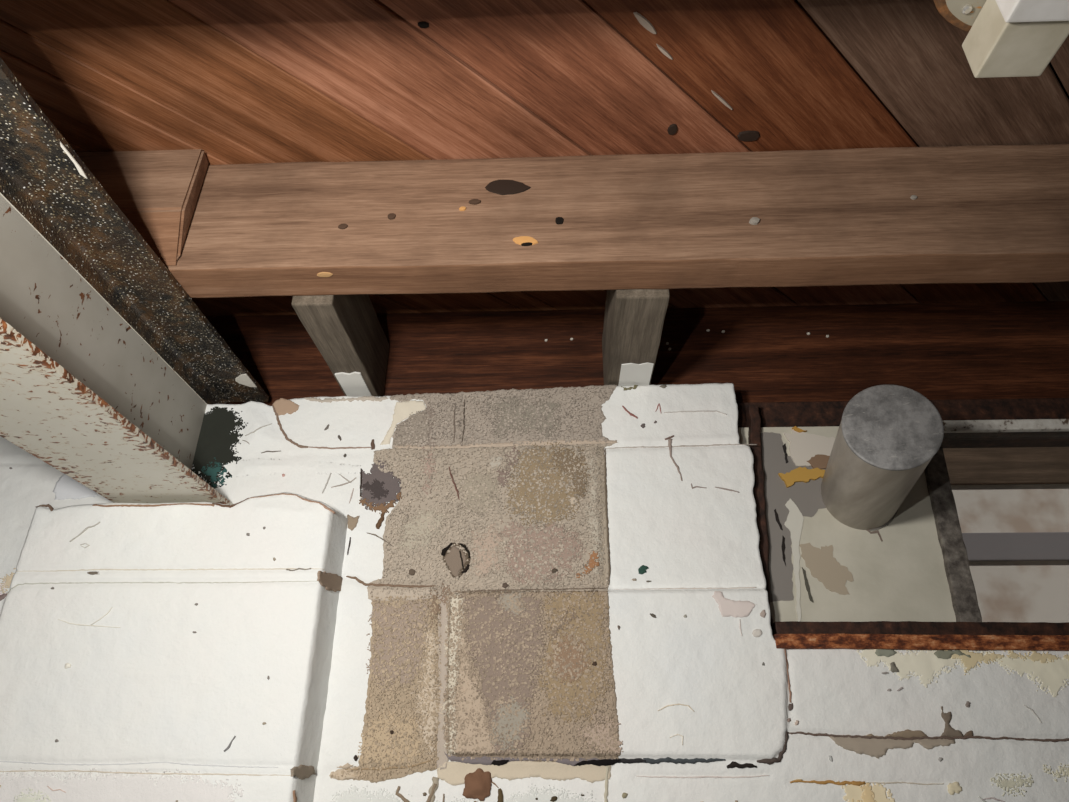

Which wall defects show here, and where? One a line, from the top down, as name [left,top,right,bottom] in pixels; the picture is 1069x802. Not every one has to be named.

peeling [273,385,638,786]
damp [331,396,623,802]
peeling [875,649,899,674]
peeling [934,650,971,659]
peeling [828,706,973,762]